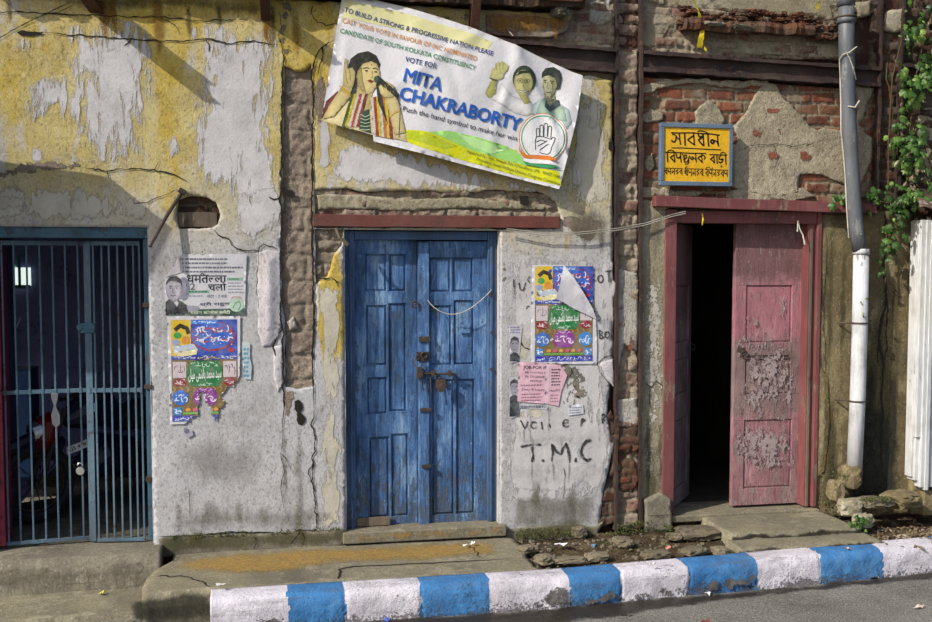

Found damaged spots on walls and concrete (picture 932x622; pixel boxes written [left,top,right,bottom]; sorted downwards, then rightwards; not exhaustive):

spalling [17,30,43,50]
peeling [0,148,153,221]
peeling [26,21,151,161]
crack [0,0,340,550]
peeling [169,136,186,157]
spalling [177,196,220,229]
peeling [190,1,601,527]
peeling [502,49,846,529]
water stain [850,299,900,497]
crack [877,213,889,473]
crack [337,545,520,579]